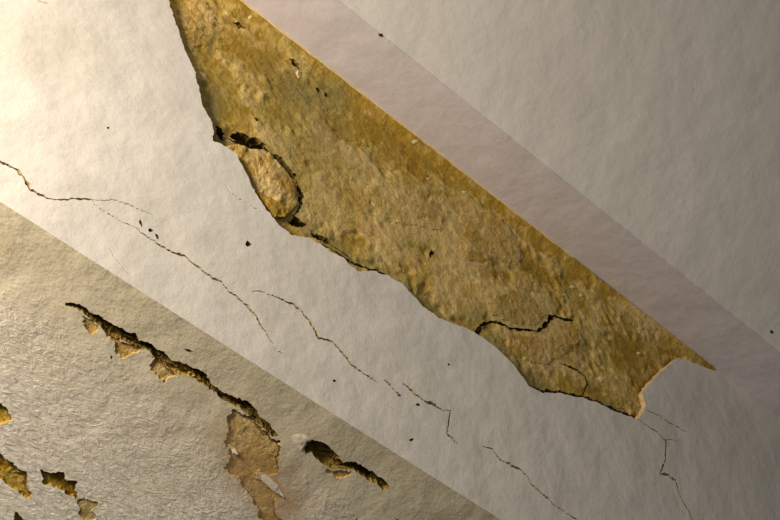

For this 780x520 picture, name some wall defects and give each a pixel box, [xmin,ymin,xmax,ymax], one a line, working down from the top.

flaking render [169,0,716,420]
crack [0,161,457,443]
peeling [0,403,12,425]
peeling [65,302,286,520]
peeling [0,453,32,499]
peeling [40,469,100,520]
flaking render [291,434,389,491]
crack [482,446,578,520]
crack [637,410,693,520]